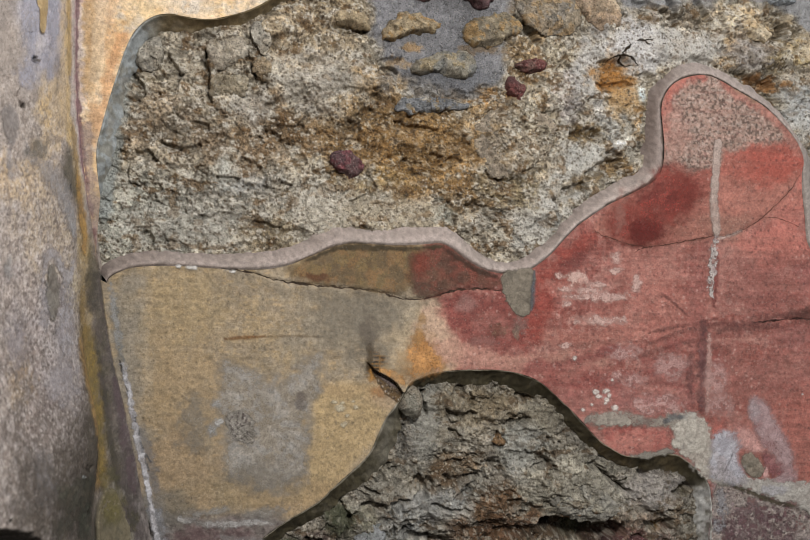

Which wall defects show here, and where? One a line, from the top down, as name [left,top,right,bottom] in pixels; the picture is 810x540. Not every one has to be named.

flaking render [96,0,810,283]
water stain [608,165,696,245]
crack [595,175,800,252]
peeling [556,271,642,306]
peeling [589,315,626,325]
crack [754,316,810,324]
peeling [657,355,687,376]
flaking render [208,410,256,444]
flaking render [260,364,810,540]